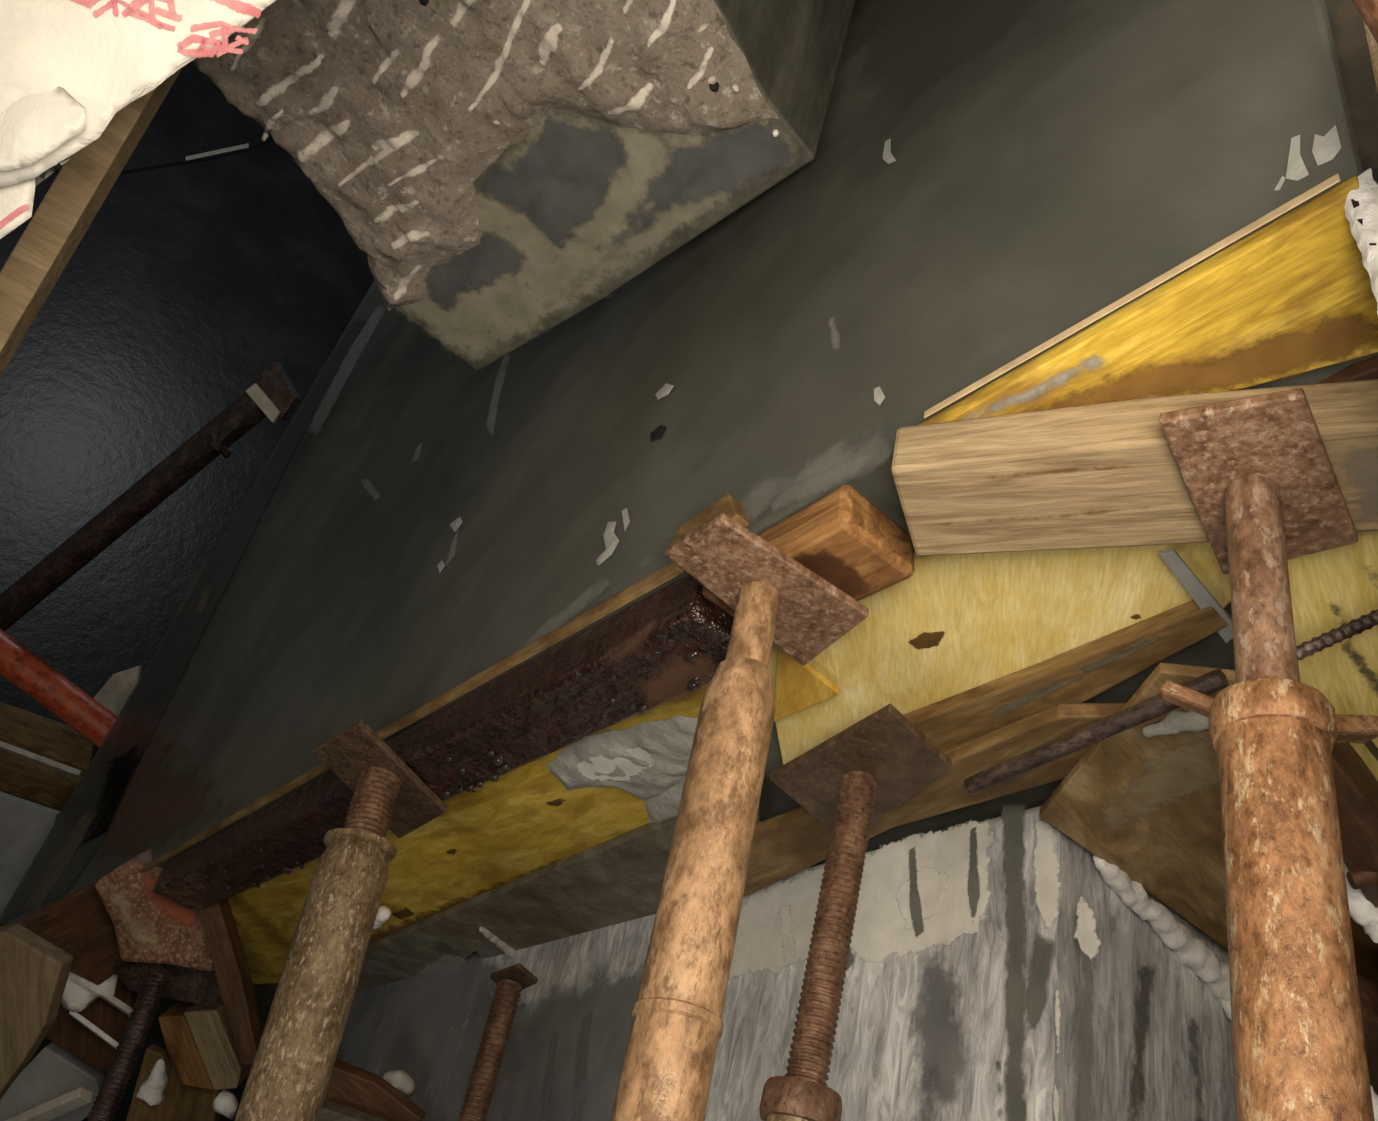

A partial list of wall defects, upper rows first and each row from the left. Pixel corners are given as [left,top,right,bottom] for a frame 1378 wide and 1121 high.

spalling [191,0,779,310]
water stain [339,953,498,1121]
water stain [485,974,641,1121]
water stain [915,963,961,1121]
water stain [996,805,1061,1121]
water stain [1078,959,1093,1121]
water stain [1131,967,1155,1121]
water stain [1189,1020,1200,1100]